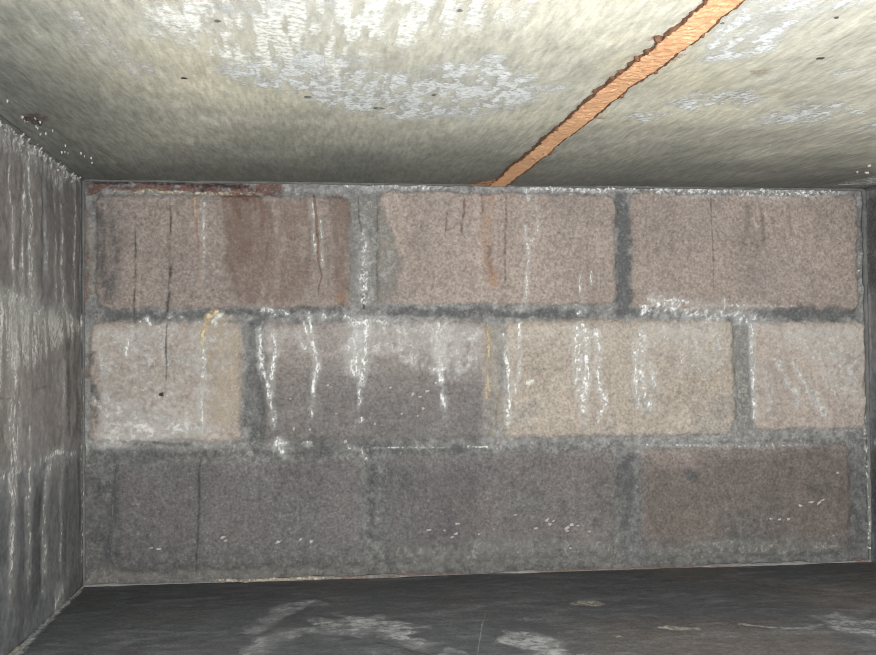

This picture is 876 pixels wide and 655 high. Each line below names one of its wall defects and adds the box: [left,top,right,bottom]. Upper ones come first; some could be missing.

water stain [526,186,635,195]
water stain [647,178,875,198]
water stain [866,199,876,285]
water stain [0,120,82,543]
water stain [301,312,320,393]
water stain [349,319,491,403]
water stain [502,333,520,426]
water stain [574,311,607,422]
water stain [633,331,659,406]
water stain [641,298,756,353]
water stain [762,359,826,417]